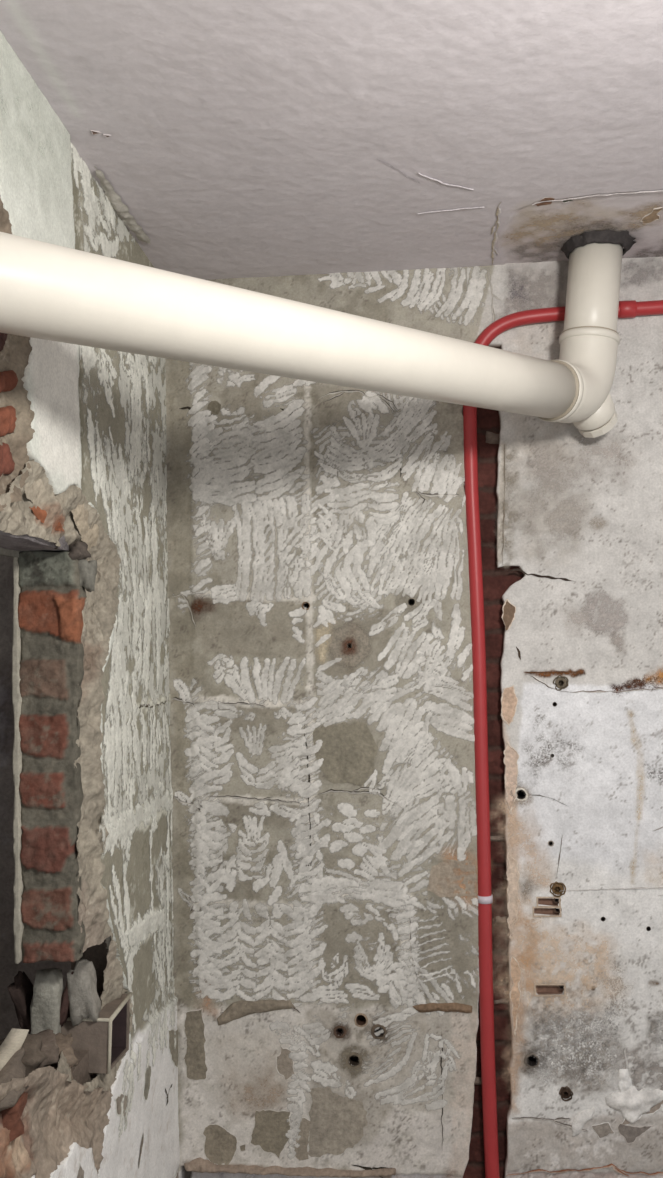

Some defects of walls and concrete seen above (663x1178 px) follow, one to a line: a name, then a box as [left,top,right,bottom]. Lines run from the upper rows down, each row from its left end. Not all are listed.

spalling [0,198,12,234]
spalling [0,333,133,1032]
corrosion [529,669,585,677]
corrosion [612,671,663,693]
spalling [54,1050,151,1126]
crack [506,1163,663,1177]